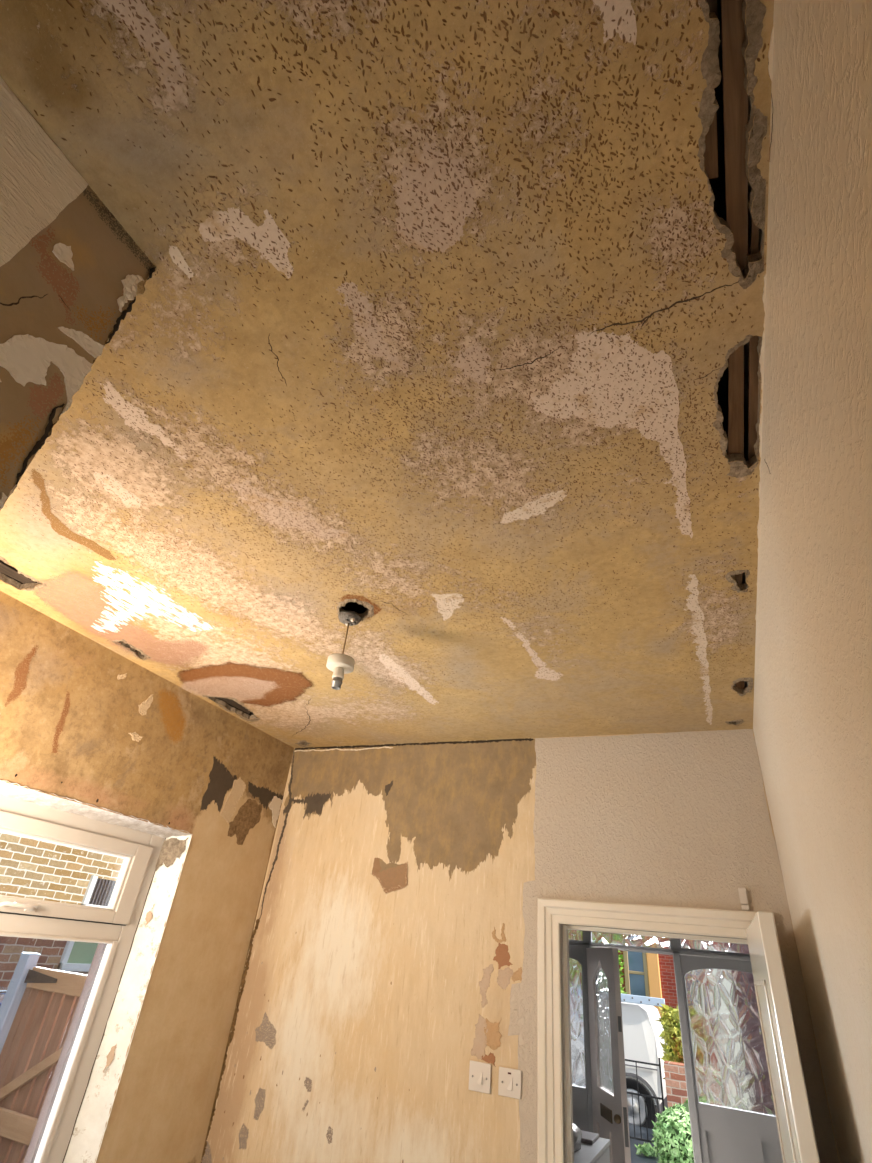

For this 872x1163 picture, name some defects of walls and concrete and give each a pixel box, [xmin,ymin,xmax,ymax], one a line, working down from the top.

flaking render [697,0,768,289]
flaking render [117,266,157,312]
crack [587,282,738,336]
crack [495,348,559,370]
flaking render [713,334,762,478]
flaking render [0,557,47,591]
peeling [91,561,215,634]
peeling [138,694,153,715]
flaking render [202,695,260,722]
peeling [200,739,536,894]
crack [201,699,533,1163]
flaking render [470,923,522,1067]